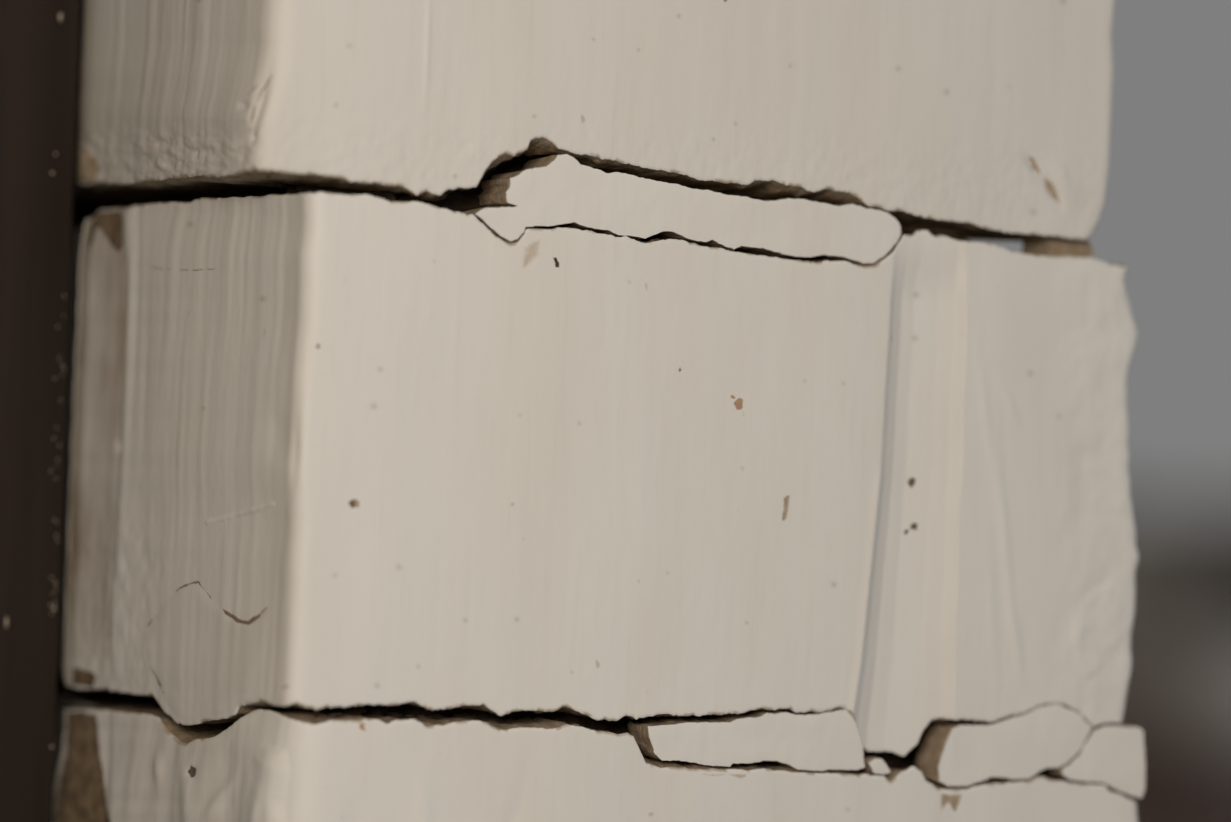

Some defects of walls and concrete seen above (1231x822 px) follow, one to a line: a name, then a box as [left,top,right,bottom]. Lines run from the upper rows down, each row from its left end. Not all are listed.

crack [180,155,543,212]
crack [152,697,162,709]
peeling [56,712,110,822]
crack [283,704,717,758]
crack [863,720,965,770]
crack [1037,772,1074,782]